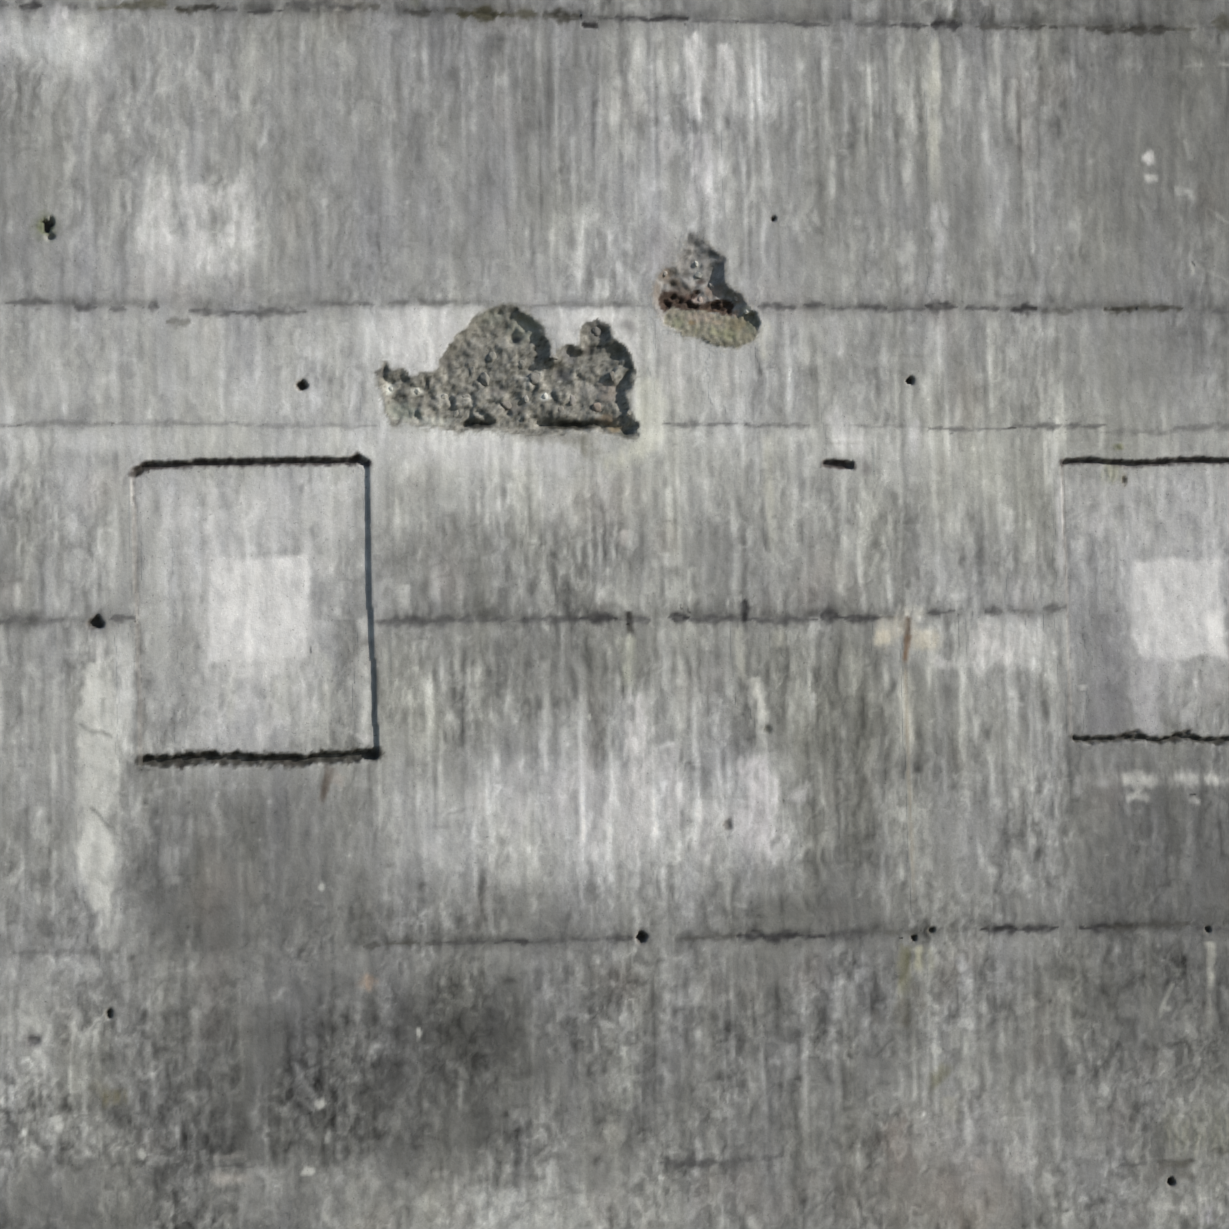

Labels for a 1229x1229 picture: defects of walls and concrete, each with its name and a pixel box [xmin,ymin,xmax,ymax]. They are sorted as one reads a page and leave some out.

spalling [645,228,759,355]
spalling [368,294,643,442]